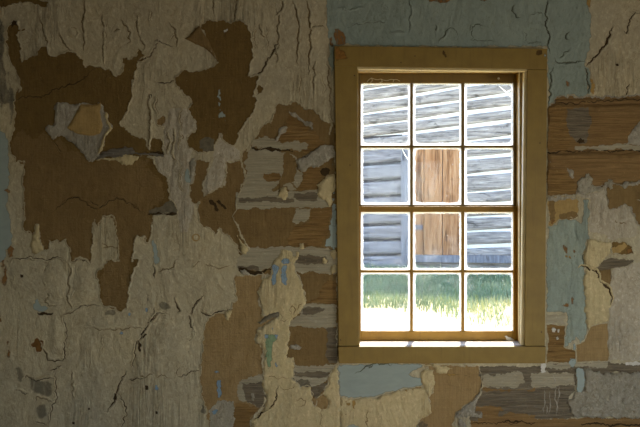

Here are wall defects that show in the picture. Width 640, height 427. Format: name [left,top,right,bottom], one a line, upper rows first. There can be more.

crack [250,0,334,135]
crack [511,0,640,104]
peeling [4,19,178,313]
crack [84,295,233,427]
peeling [173,19,339,427]
peeling [417,363,483,427]
peeling [546,195,580,227]
peeling [541,240,635,373]
crack [578,254,614,306]